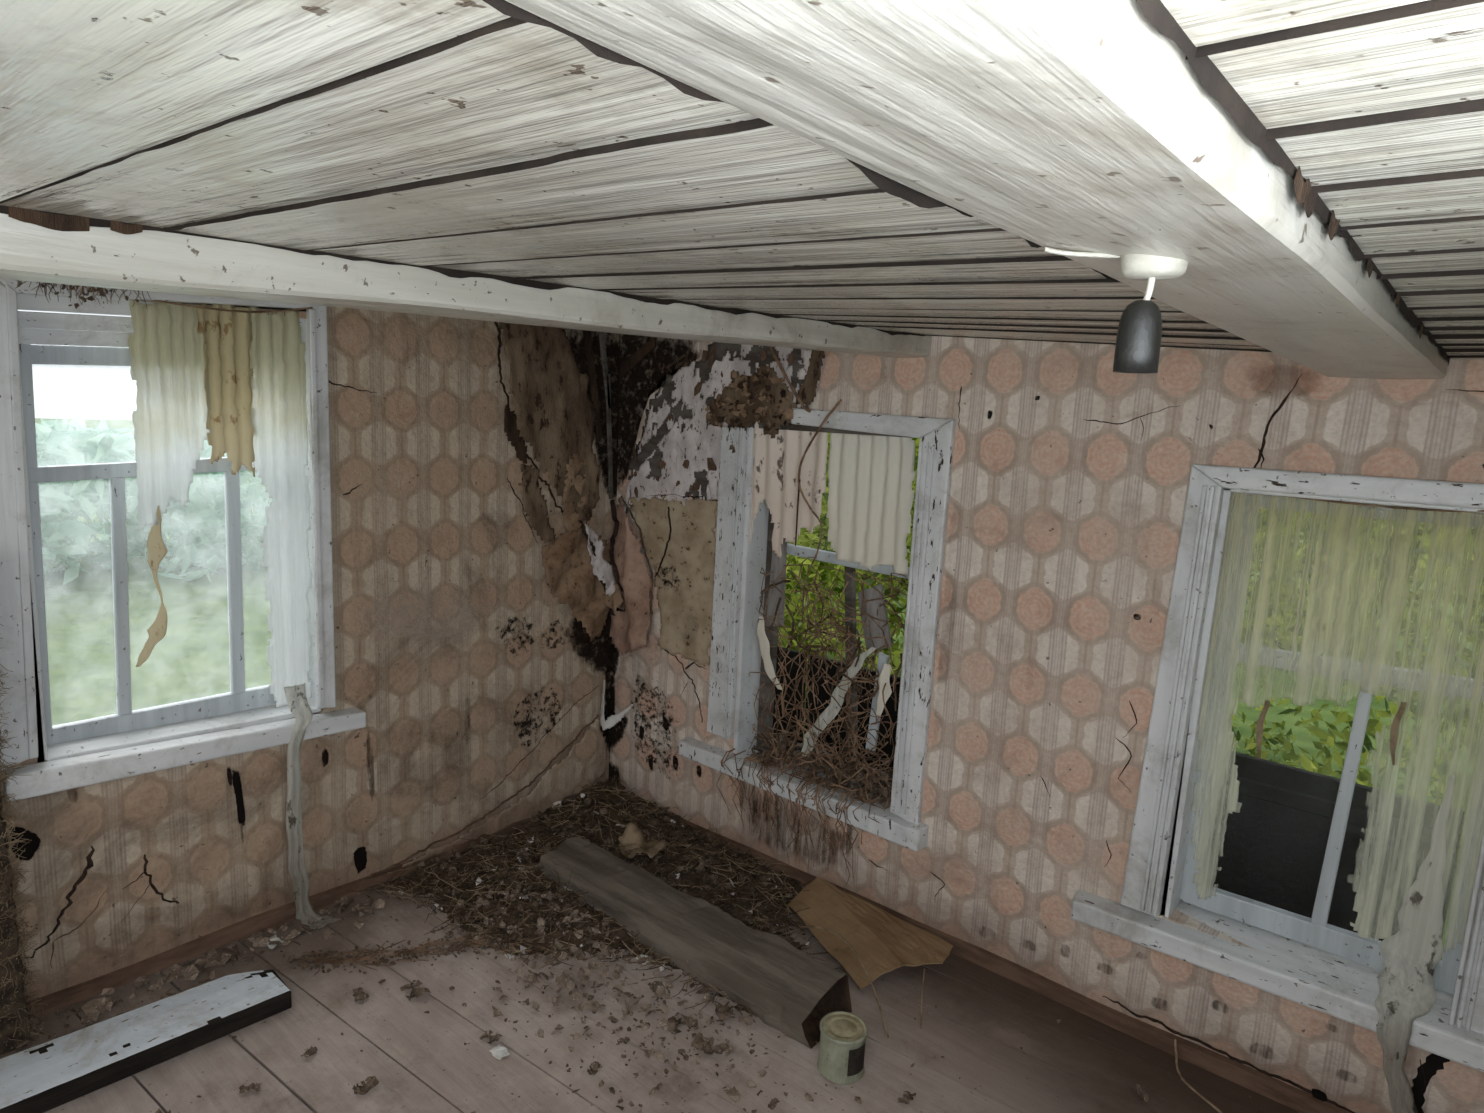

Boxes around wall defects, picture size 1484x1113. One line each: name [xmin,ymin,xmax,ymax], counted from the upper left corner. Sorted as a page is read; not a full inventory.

crack [1253,375,1301,468]
flaking render [564,329,825,667]
damp [497,611,679,778]
crack [25,846,179,969]
crack [1102,996,1355,1113]
crack [1411,1053,1450,1113]